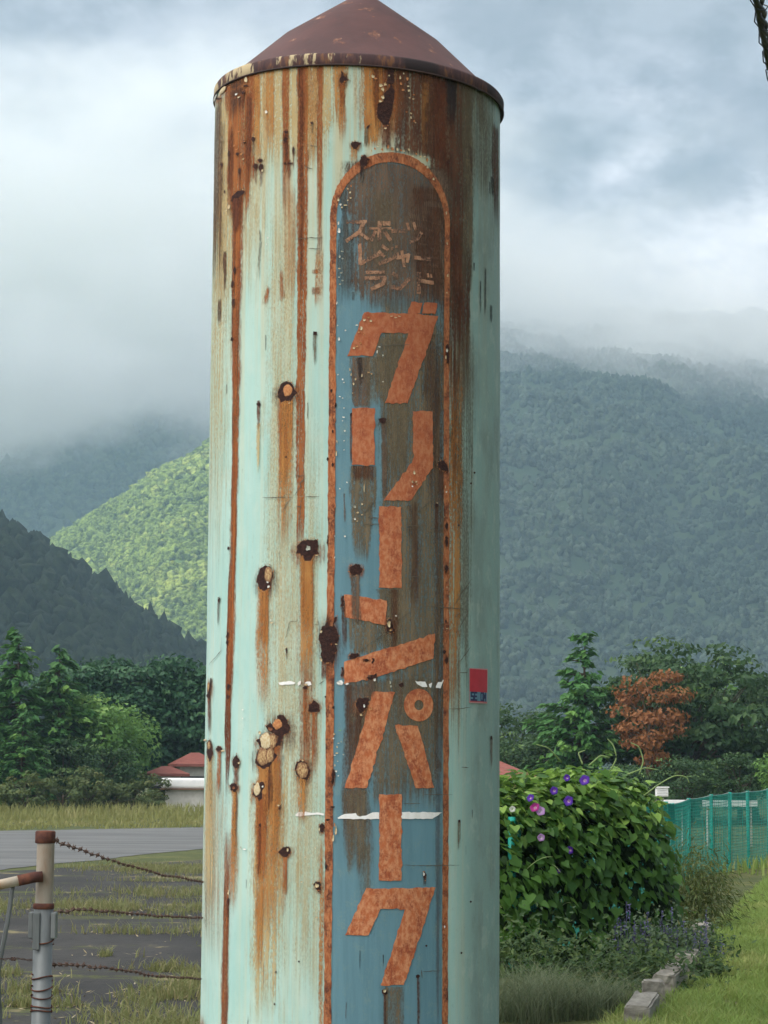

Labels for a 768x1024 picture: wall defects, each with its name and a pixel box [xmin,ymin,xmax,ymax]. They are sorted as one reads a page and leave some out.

rust [206,65,347,803]
rust [357,66,471,707]
rust [221,840,230,1024]
rust [255,891,263,958]
rust [315,849,324,1024]